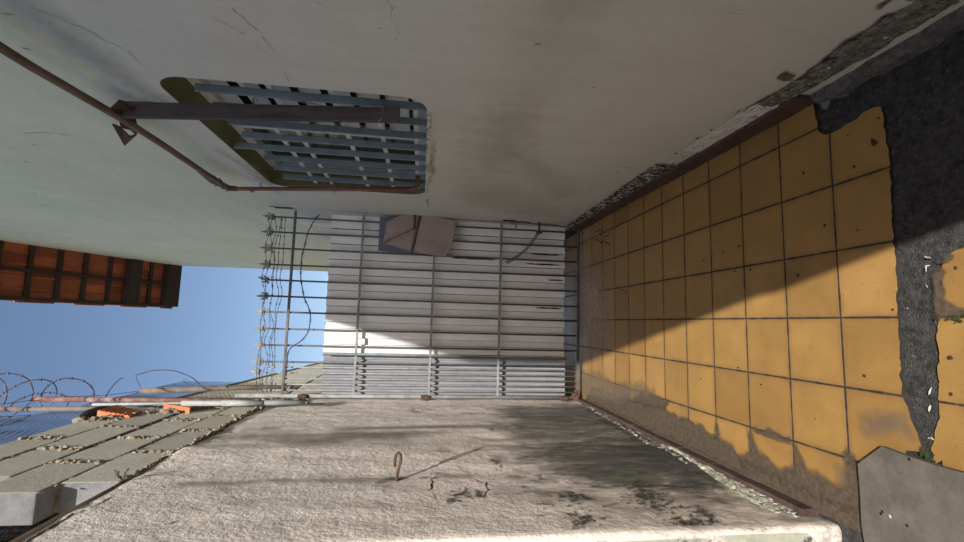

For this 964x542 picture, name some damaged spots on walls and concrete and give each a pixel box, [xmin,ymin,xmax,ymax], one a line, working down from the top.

flaking render [566,0,960,226]
damp [513,408,715,492]